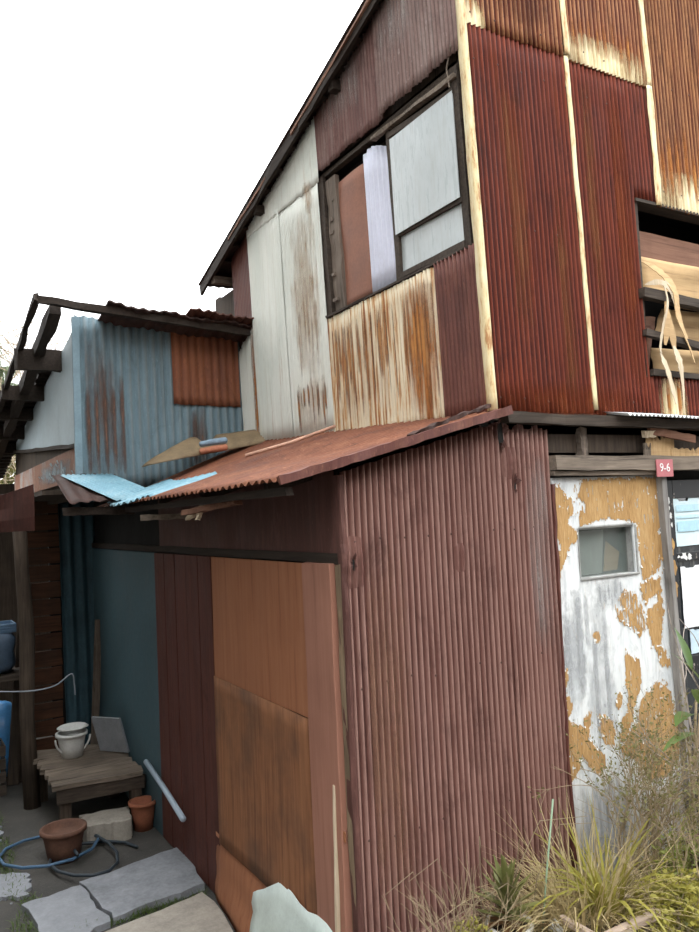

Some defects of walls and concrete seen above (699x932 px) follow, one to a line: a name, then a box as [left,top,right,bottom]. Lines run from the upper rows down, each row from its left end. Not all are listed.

rust [297,387,327,430]
rust [332,314,398,403]
rust [404,292,439,409]
rust [534,390,614,415]
peeling [555,476,692,667]
peeling [565,648,680,784]